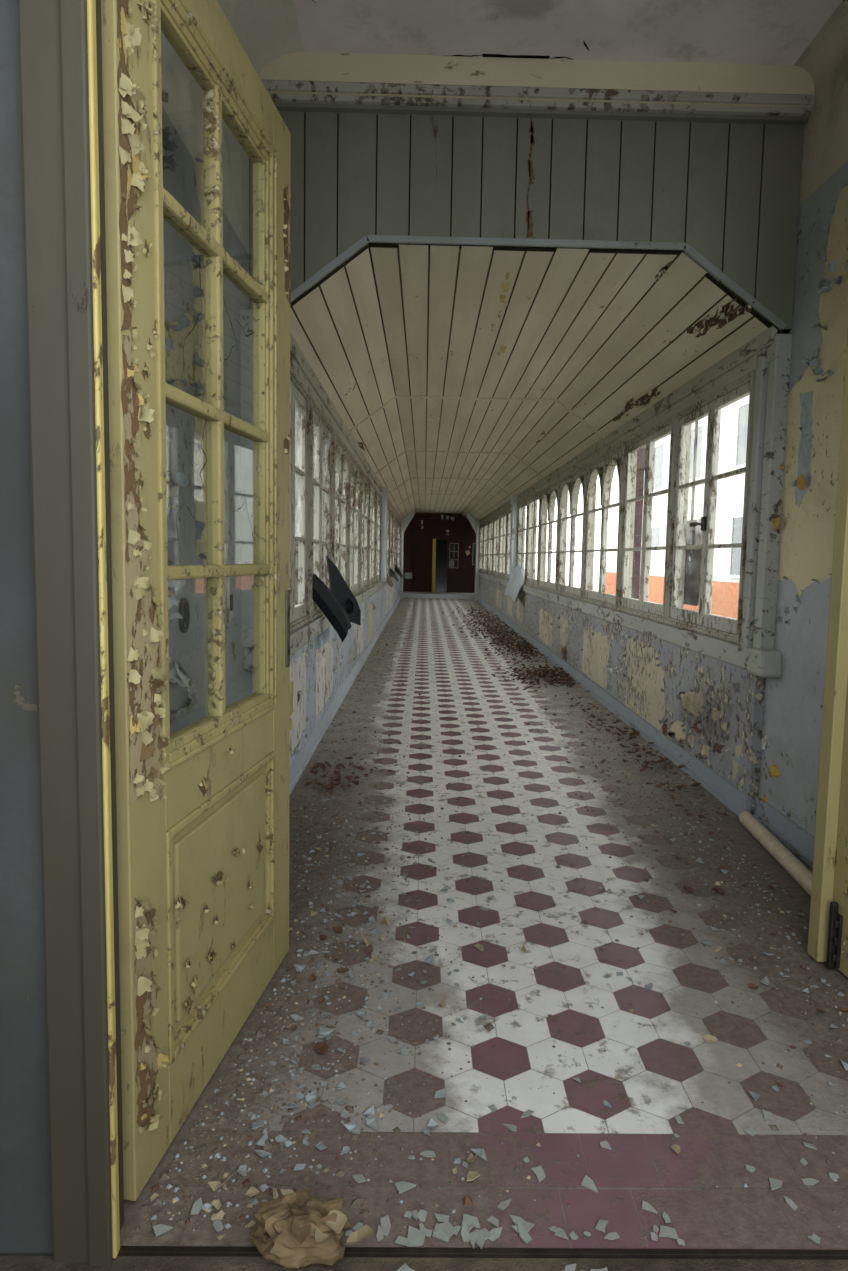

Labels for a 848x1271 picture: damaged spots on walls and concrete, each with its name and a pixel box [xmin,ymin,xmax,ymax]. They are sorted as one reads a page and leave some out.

peeling [117,0,207,805]
peeling [774,184,848,625]
peeling [290,580,393,758]
peeling [537,608,569,657]
peeling [582,628,743,791]
peeling [134,898,169,1135]